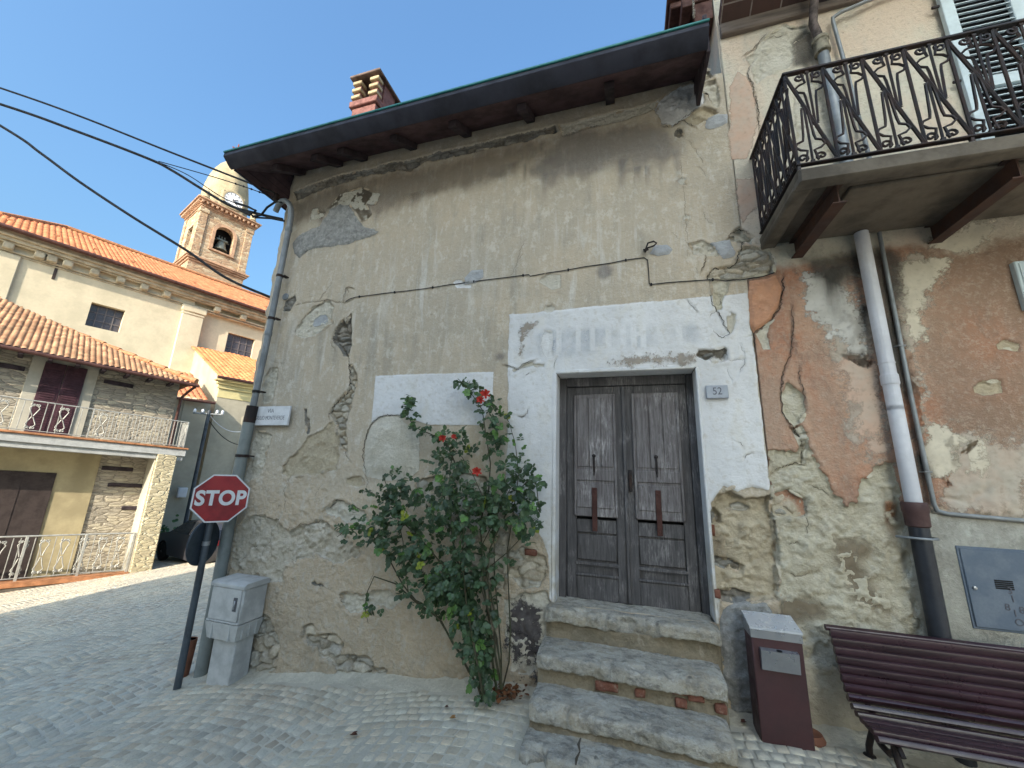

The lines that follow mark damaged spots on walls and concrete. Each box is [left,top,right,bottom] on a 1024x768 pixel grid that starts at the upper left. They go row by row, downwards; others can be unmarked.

spalling [294,24,810,221]
peeling [282,301,358,478]
spalling [696,346,728,364]
crack [662,93,807,473]
spalling [689,178,782,350]
peeling [710,271,922,667]
peeling [896,220,1024,518]
spalling [299,623,387,674]
water stain [502,593,542,685]